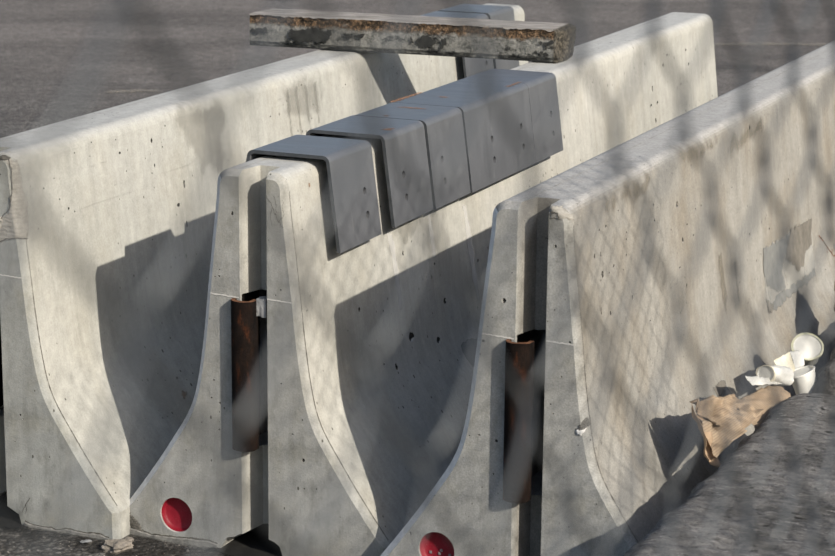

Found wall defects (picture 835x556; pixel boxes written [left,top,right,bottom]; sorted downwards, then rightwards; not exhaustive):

peeling [763,218,812,313]